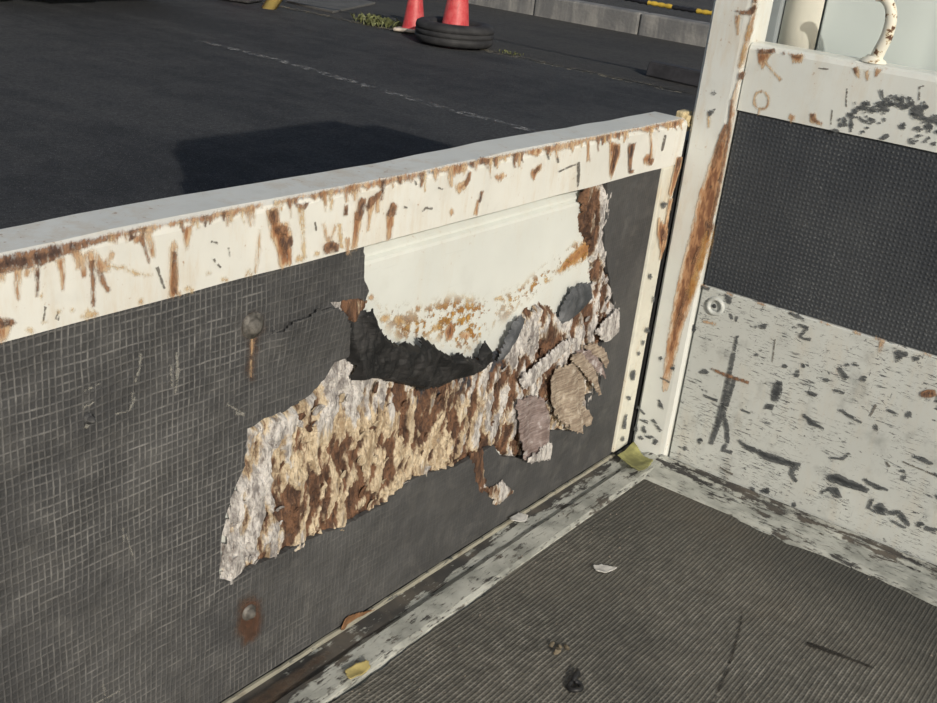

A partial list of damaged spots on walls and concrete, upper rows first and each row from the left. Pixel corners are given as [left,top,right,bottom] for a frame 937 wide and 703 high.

peeling [830,89,937,146]
corrosion [0,119,684,317]
corrosion [663,0,803,392]
corrosion [0,318,14,342]
corrosion [380,300,489,345]
peeling [894,348,920,363]
peeling [220,184,620,585]
peeling [765,381,782,410]
peeling [920,389,937,398]
peeling [738,439,801,482]
peeling [821,474,937,534]
corrosion [238,600,261,644]